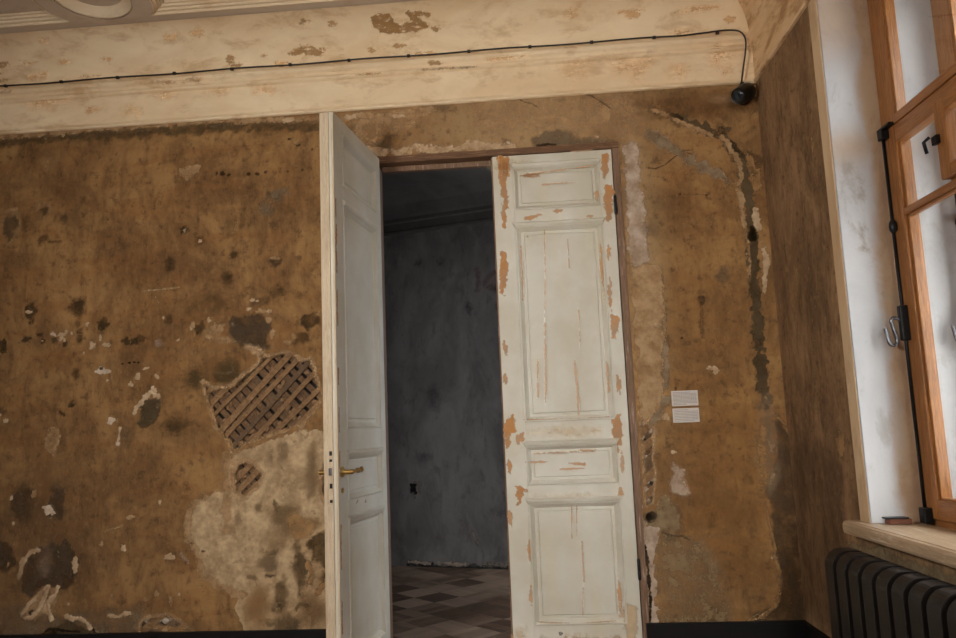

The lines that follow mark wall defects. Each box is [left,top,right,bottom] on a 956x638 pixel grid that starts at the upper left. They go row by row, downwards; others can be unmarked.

peeling [371,10,438,48]
flaking render [496,141,671,420]
leakage [191,304,320,352]
leakage [10,479,65,525]
flaking render [164,429,326,630]
leakage [0,539,80,597]
leakage [0,606,145,635]